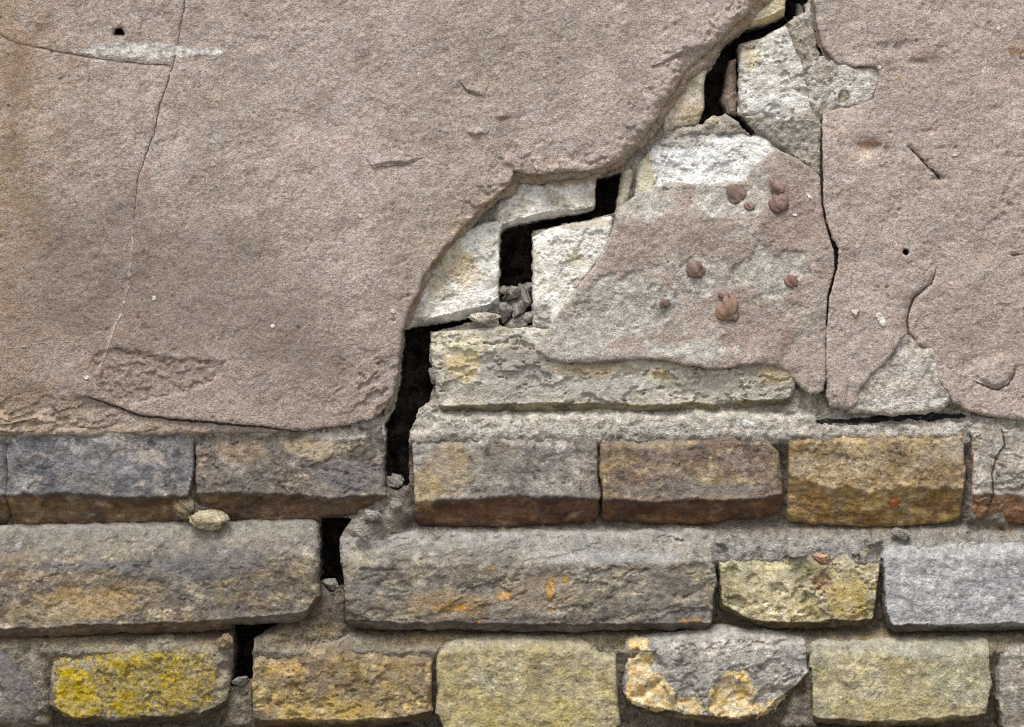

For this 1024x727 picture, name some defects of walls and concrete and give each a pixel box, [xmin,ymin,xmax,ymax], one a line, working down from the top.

crack [699,0,833,124]
crack [0,0,185,370]
crack [499,177,619,326]
crack [819,120,839,327]
crack [0,397,297,432]
crack [388,319,473,484]
crack [986,427,1006,513]
crack [324,517,351,584]
crack [238,623,273,677]